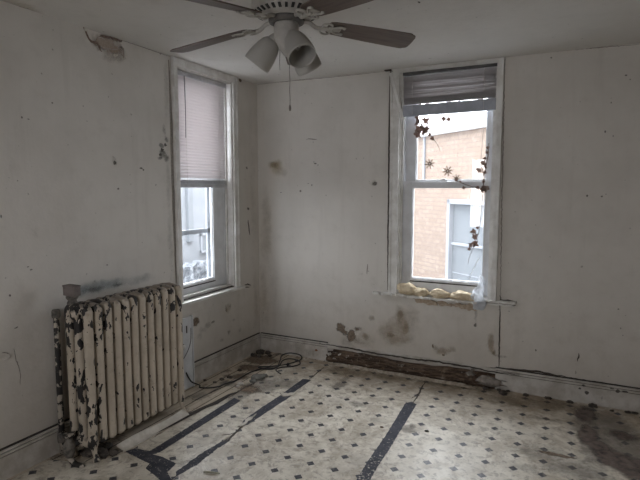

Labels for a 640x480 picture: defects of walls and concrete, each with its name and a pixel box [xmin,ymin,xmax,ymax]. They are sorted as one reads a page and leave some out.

flaking render [83,27,124,58]
crack [320,65,618,385]
spalling [413,298,477,311]
spalling [337,323,361,341]